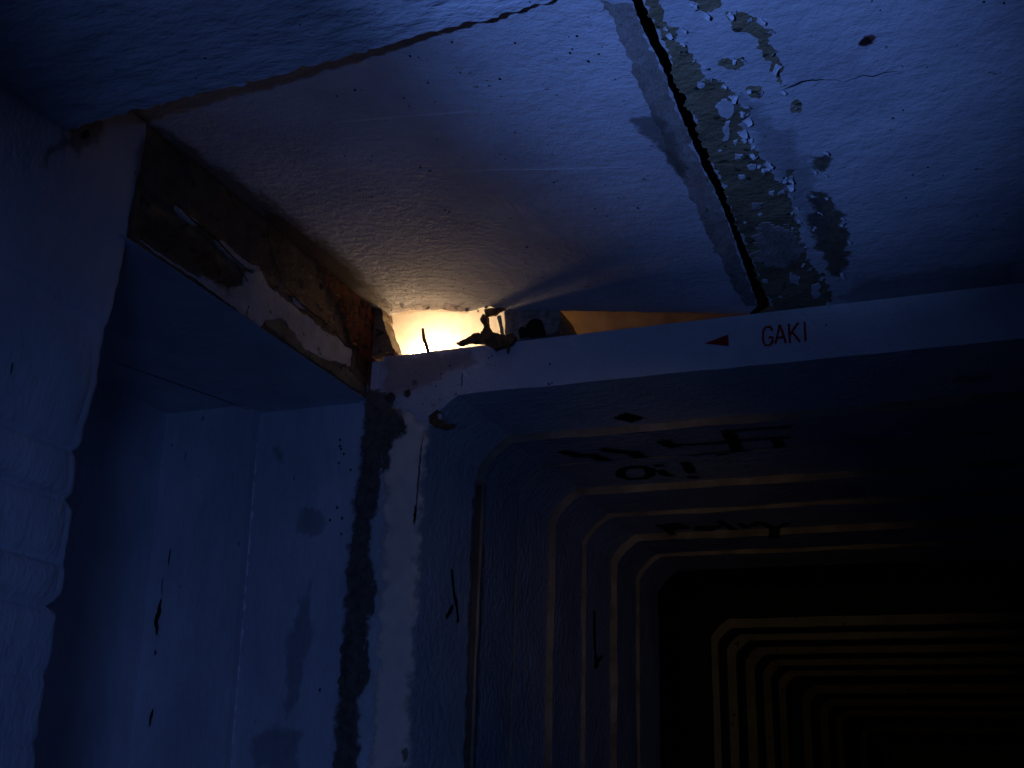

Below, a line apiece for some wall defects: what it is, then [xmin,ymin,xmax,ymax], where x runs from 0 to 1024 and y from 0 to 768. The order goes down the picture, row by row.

peeling [140,240,365,391]
peeling [561,0,852,334]
crack [785,71,896,89]
leakage [333,389,407,768]